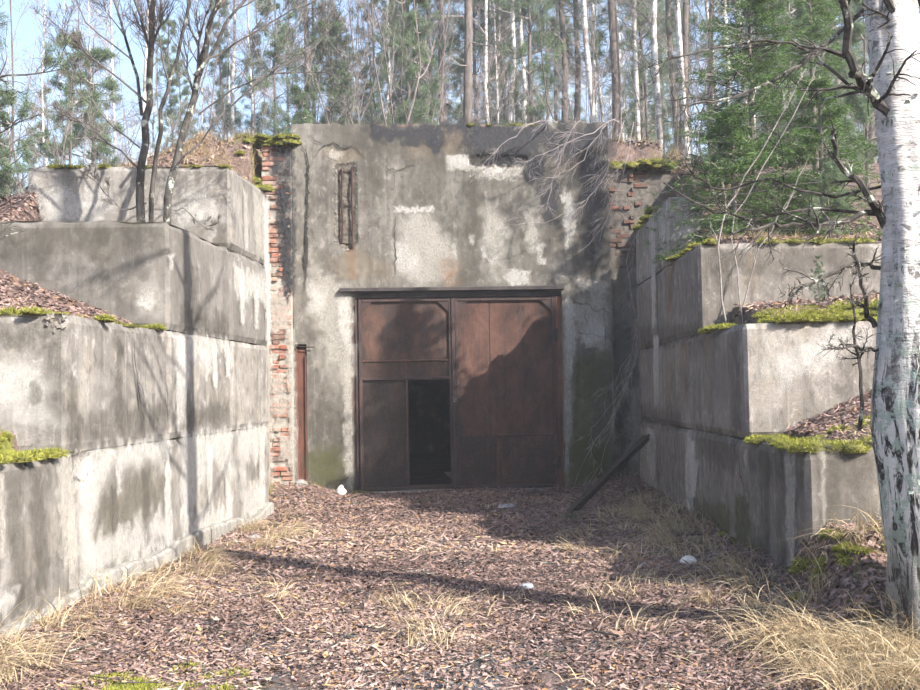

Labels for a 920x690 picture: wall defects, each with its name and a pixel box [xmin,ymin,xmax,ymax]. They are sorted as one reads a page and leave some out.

crack [299,137,365,289]
spalling [330,153,361,251]
crack [387,165,417,276]
water stain [364,117,613,274]
flaking render [269,291,297,462]
water stain [60,441,169,568]
water stain [181,427,264,531]